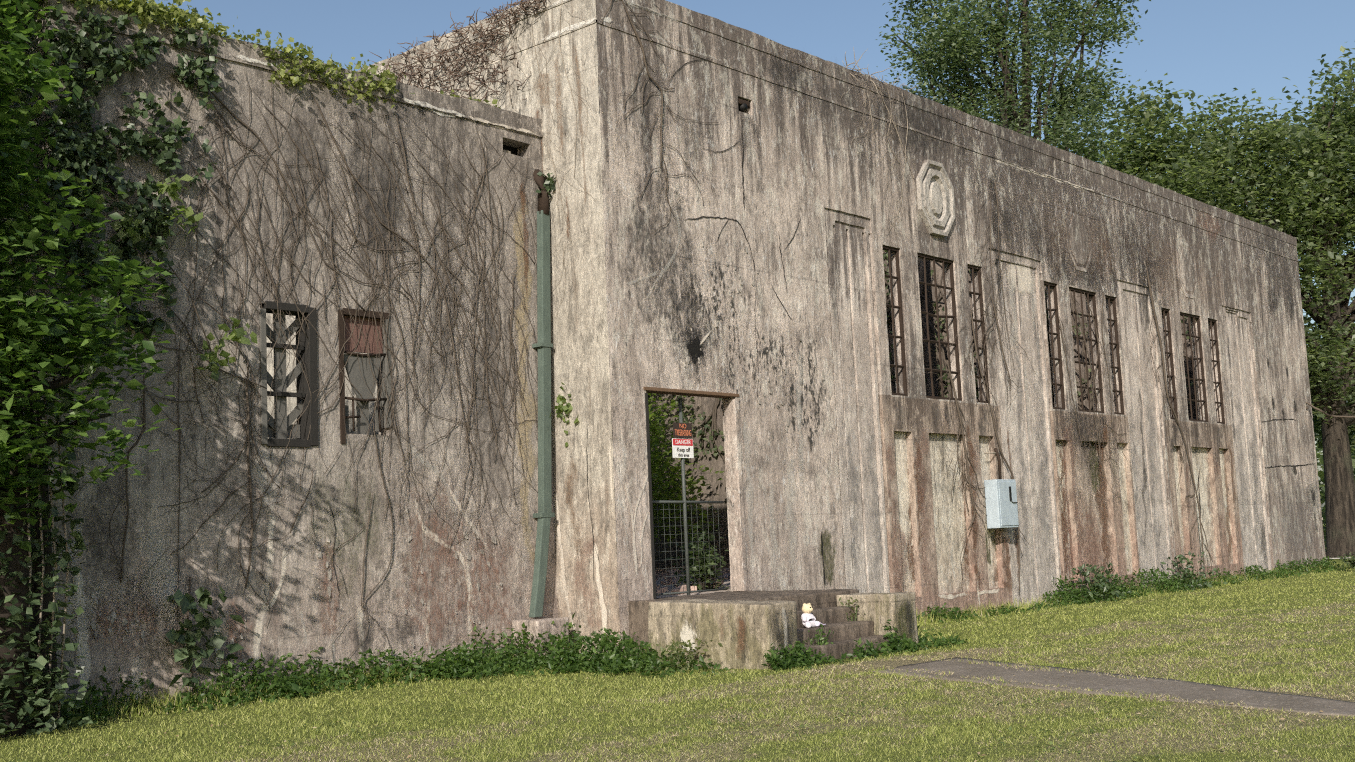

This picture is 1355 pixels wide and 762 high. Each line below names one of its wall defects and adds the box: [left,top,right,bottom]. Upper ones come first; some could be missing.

damp [878,100,949,155]
damp [628,171,716,358]
damp [991,160,1092,293]
damp [253,513,286,669]
rust [907,443,923,578]
rust [961,431,980,580]
rust [996,529,1019,587]
rust [1058,429,1109,586]
rust [1224,450,1235,559]